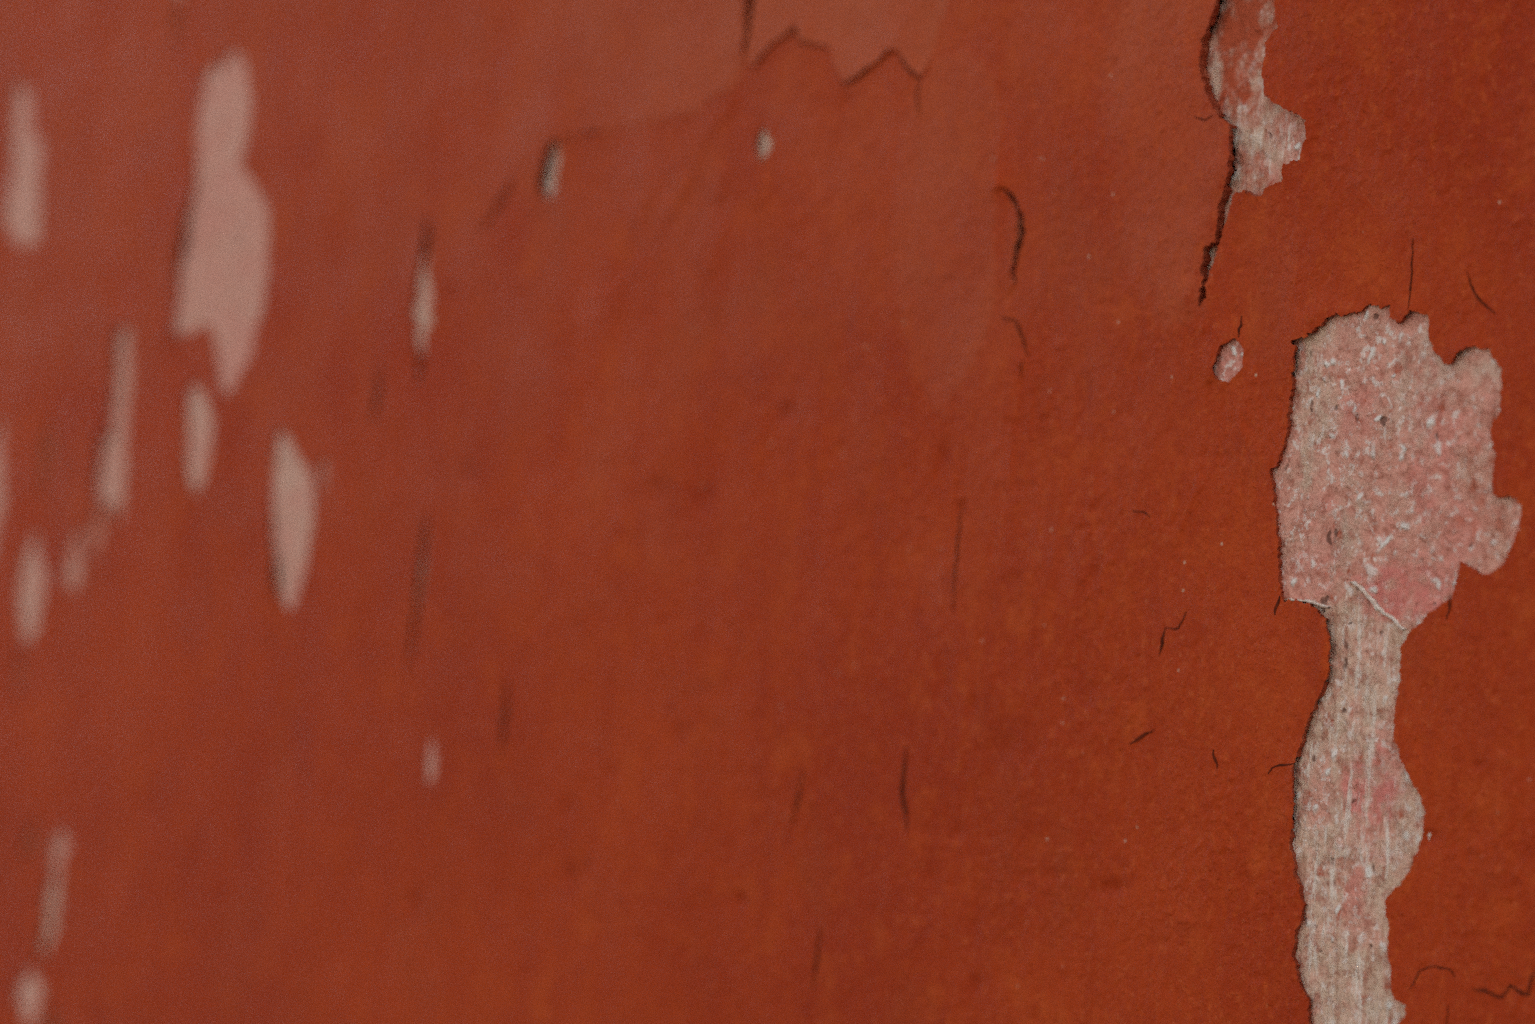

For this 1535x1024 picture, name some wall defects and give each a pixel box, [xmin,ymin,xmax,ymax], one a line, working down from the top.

crack [742,0,753,55]
peeling [0,82,43,248]
peeling [1198,0,1306,307]
peeling [171,51,269,494]
crack [998,187,1029,377]
peeling [16,526,82,650]
peeling [92,325,131,525]
peeling [269,429,314,610]
peeling [1269,303,1521,1024]